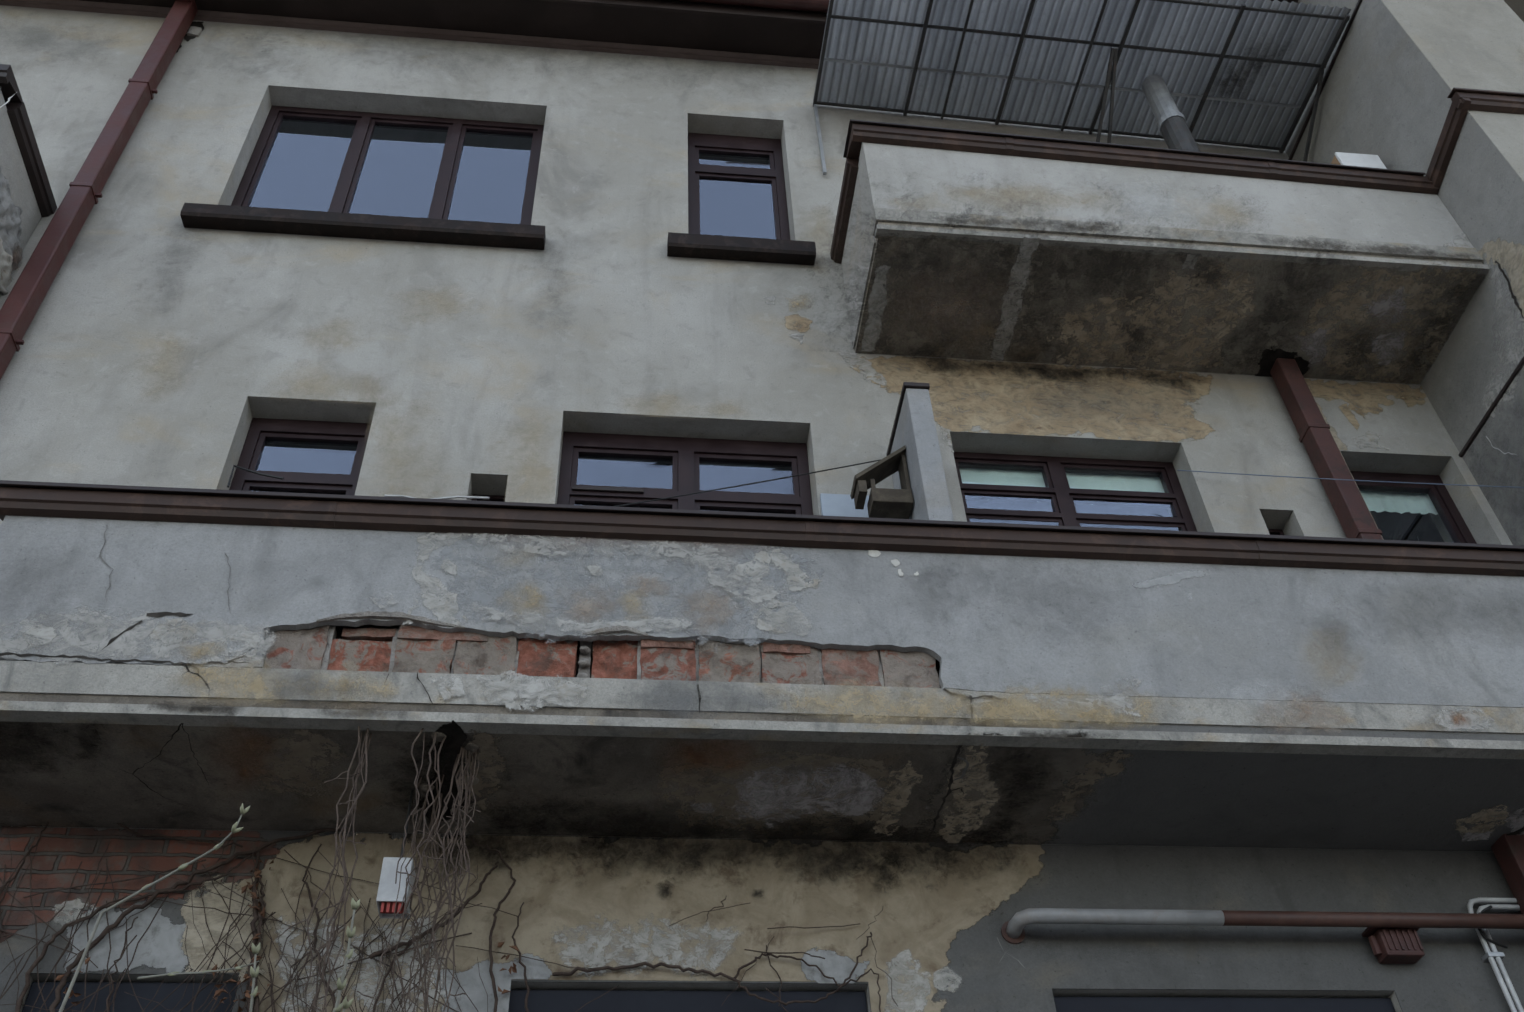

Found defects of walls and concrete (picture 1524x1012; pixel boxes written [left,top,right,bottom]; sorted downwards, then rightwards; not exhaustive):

spalling [0,166,23,295]
leakage [838,206,1206,362]
flaking render [1281,233,1524,418]
peeling [1255,328,1426,540]
crack [0,525,257,697]
spalling [0,532,941,711]
flaking render [0,720,1127,1012]
leakage [421,688,1151,896]
spalling [1455,805,1524,841]